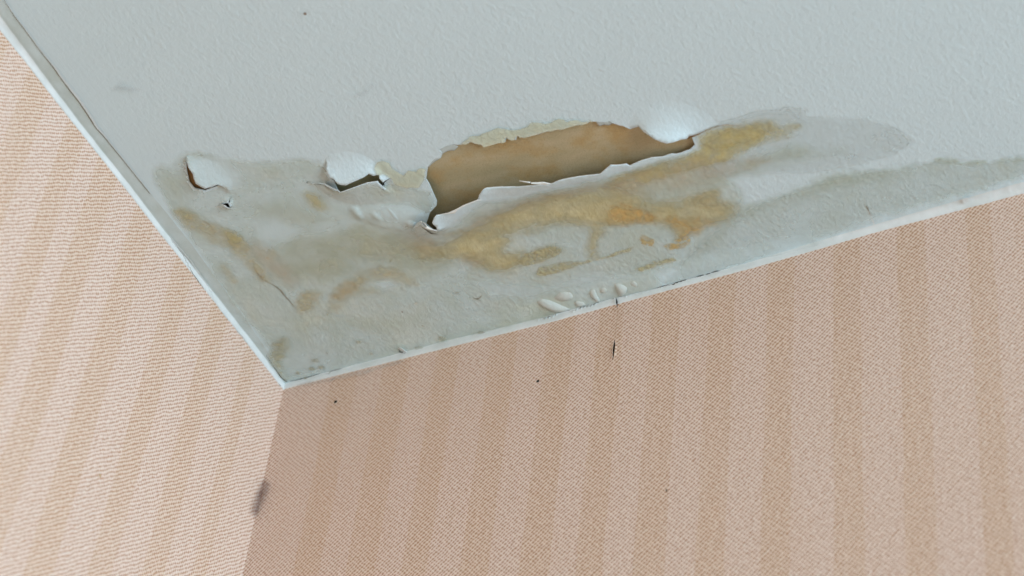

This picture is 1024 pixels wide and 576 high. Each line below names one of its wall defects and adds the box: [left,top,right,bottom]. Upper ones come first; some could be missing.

damp [461,119,592,148]
peeling [186,155,233,207]
peeling [307,152,391,206]
peeling [411,102,735,245]
damp [225,125,765,360]